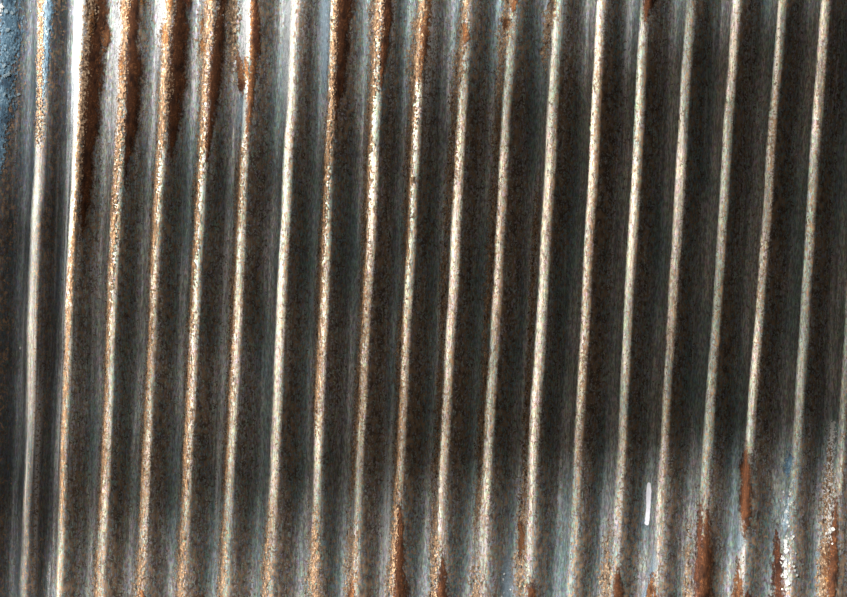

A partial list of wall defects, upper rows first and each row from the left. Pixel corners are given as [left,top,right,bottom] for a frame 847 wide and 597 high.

rust [738,440,753,538]
rust [731,556,750,597]
rust [768,520,785,597]